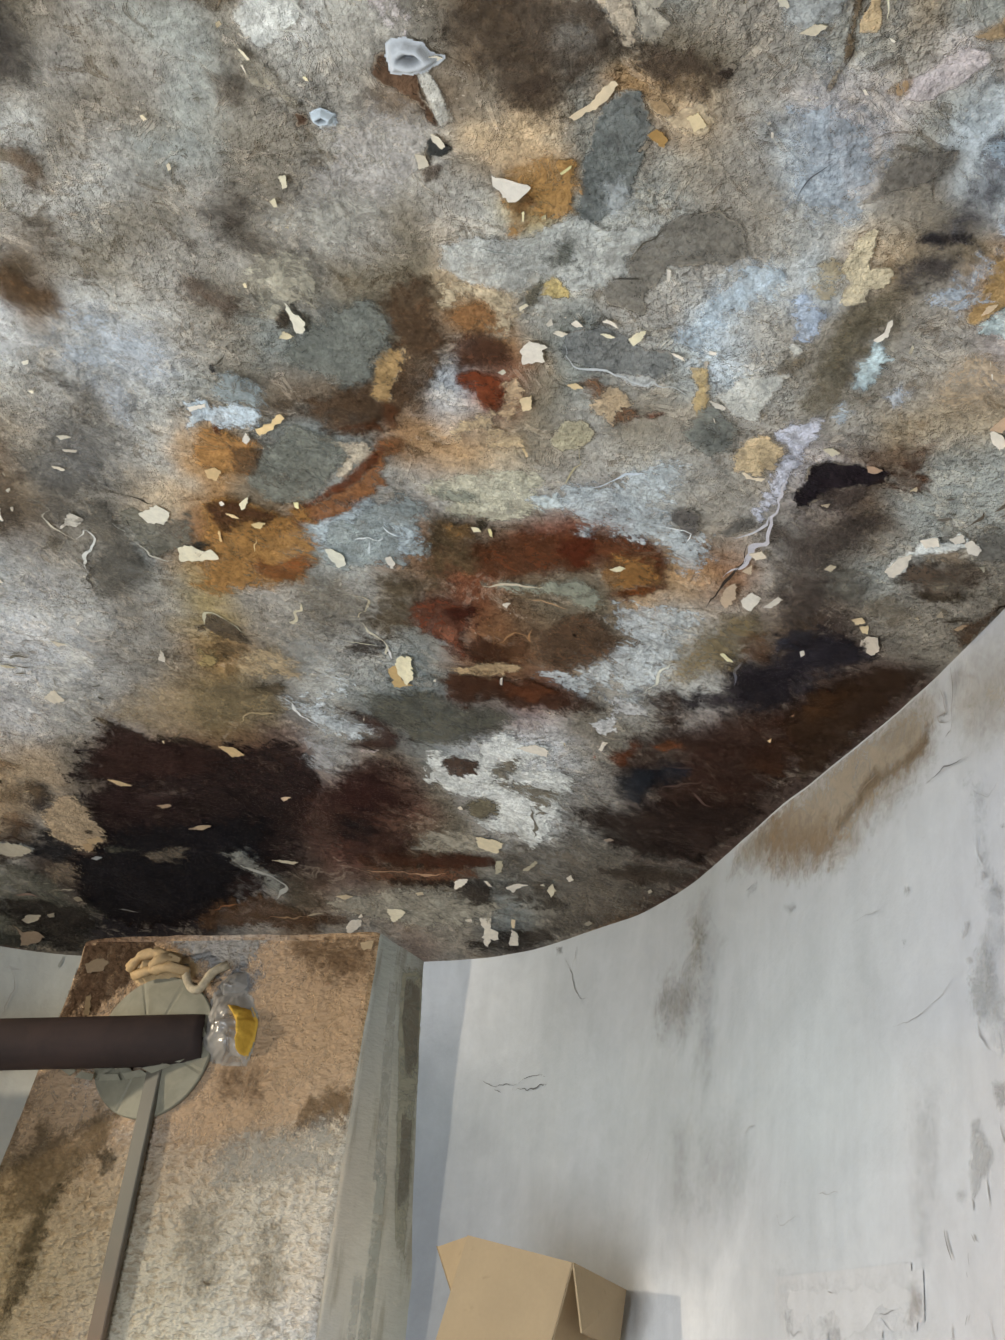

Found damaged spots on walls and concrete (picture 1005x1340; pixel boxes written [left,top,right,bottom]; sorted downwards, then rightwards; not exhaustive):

leakage [442,0,737,110]
peeling [215,0,452,388]
peeling [441,81,806,484]
corrosion [190,276,532,598]
peeling [304,493,431,571]
leakage [423,136,1005,717]
spalling [793,448,932,509]
leakage [484,581,704,747]
peeling [40,794,106,902]
leakage [0,668,712,1185]
peeling [326,830,573,947]
leakage [750,701,929,860]